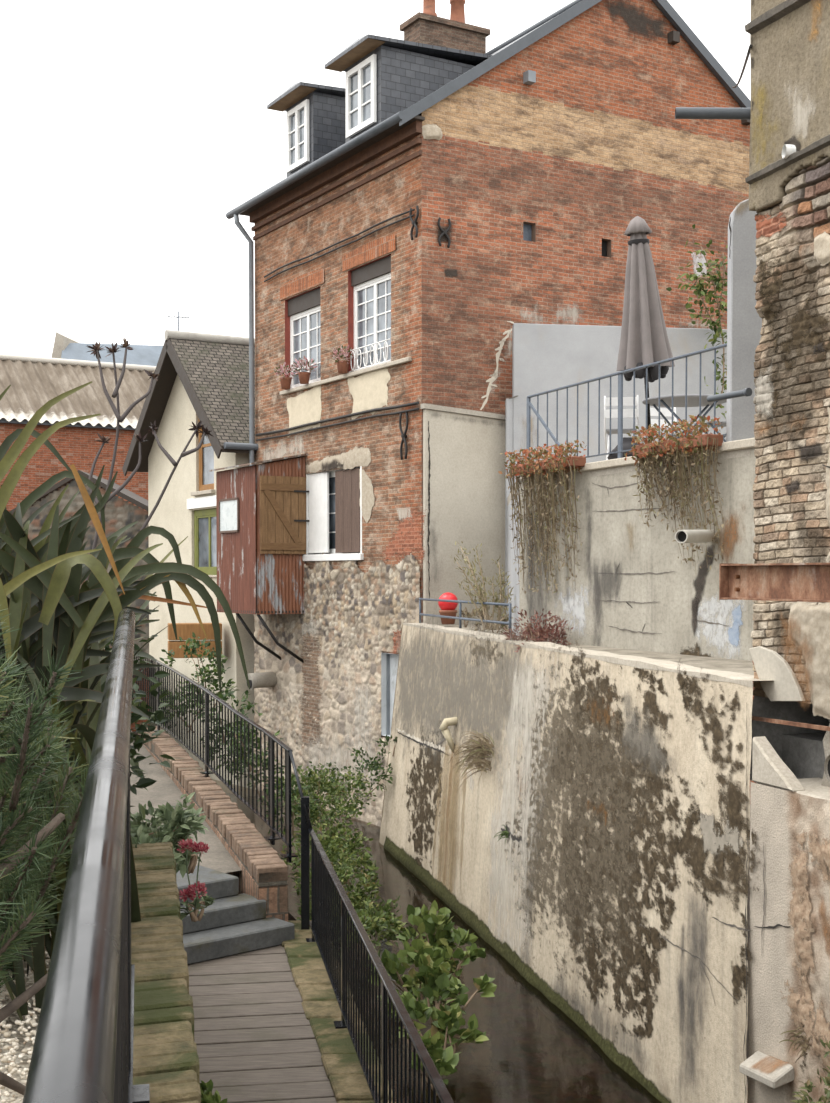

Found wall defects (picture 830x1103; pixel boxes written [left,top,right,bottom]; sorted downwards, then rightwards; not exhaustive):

spalling [754,212,787,238]
peeling [306,446,375,523]
spalling [786,481,800,495]
peeling [799,407,830,527]
rust [719,516,738,558]
leakage [720,691,740,721]
leakage [395,628,549,955]
crack [626,717,790,1103]
leakage [560,880,676,1038]
leakage [679,920,702,1030]
leakage [731,913,752,1004]